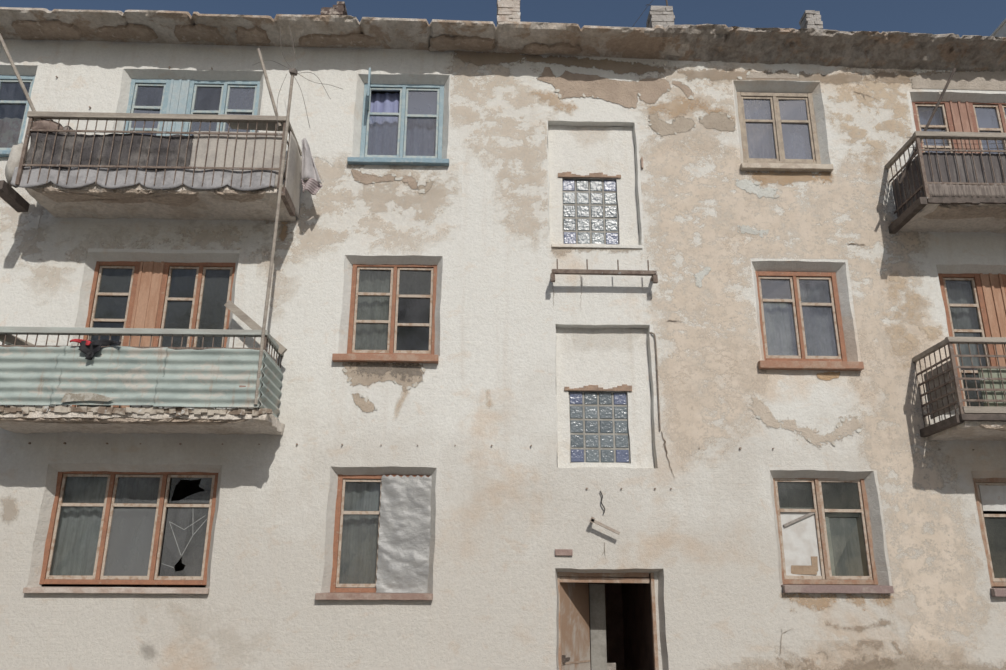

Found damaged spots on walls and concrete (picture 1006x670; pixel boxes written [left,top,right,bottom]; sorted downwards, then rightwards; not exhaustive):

peeling [427,35,547,235]
peeling [268,162,447,275]
spalling [0,405,273,425]
flaking render [342,362,426,413]
peeling [536,67,1006,670]
damp [772,624,1006,670]